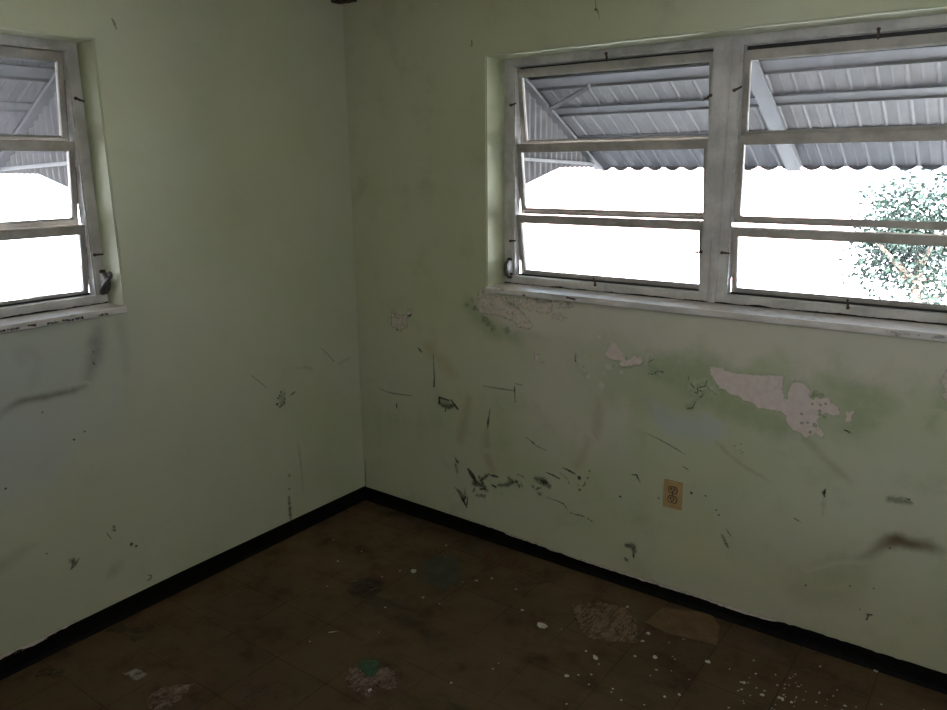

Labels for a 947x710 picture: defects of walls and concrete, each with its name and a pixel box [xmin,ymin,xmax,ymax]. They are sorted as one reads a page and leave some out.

peeling [709,365,854,439]
leakage [800,529,947,574]